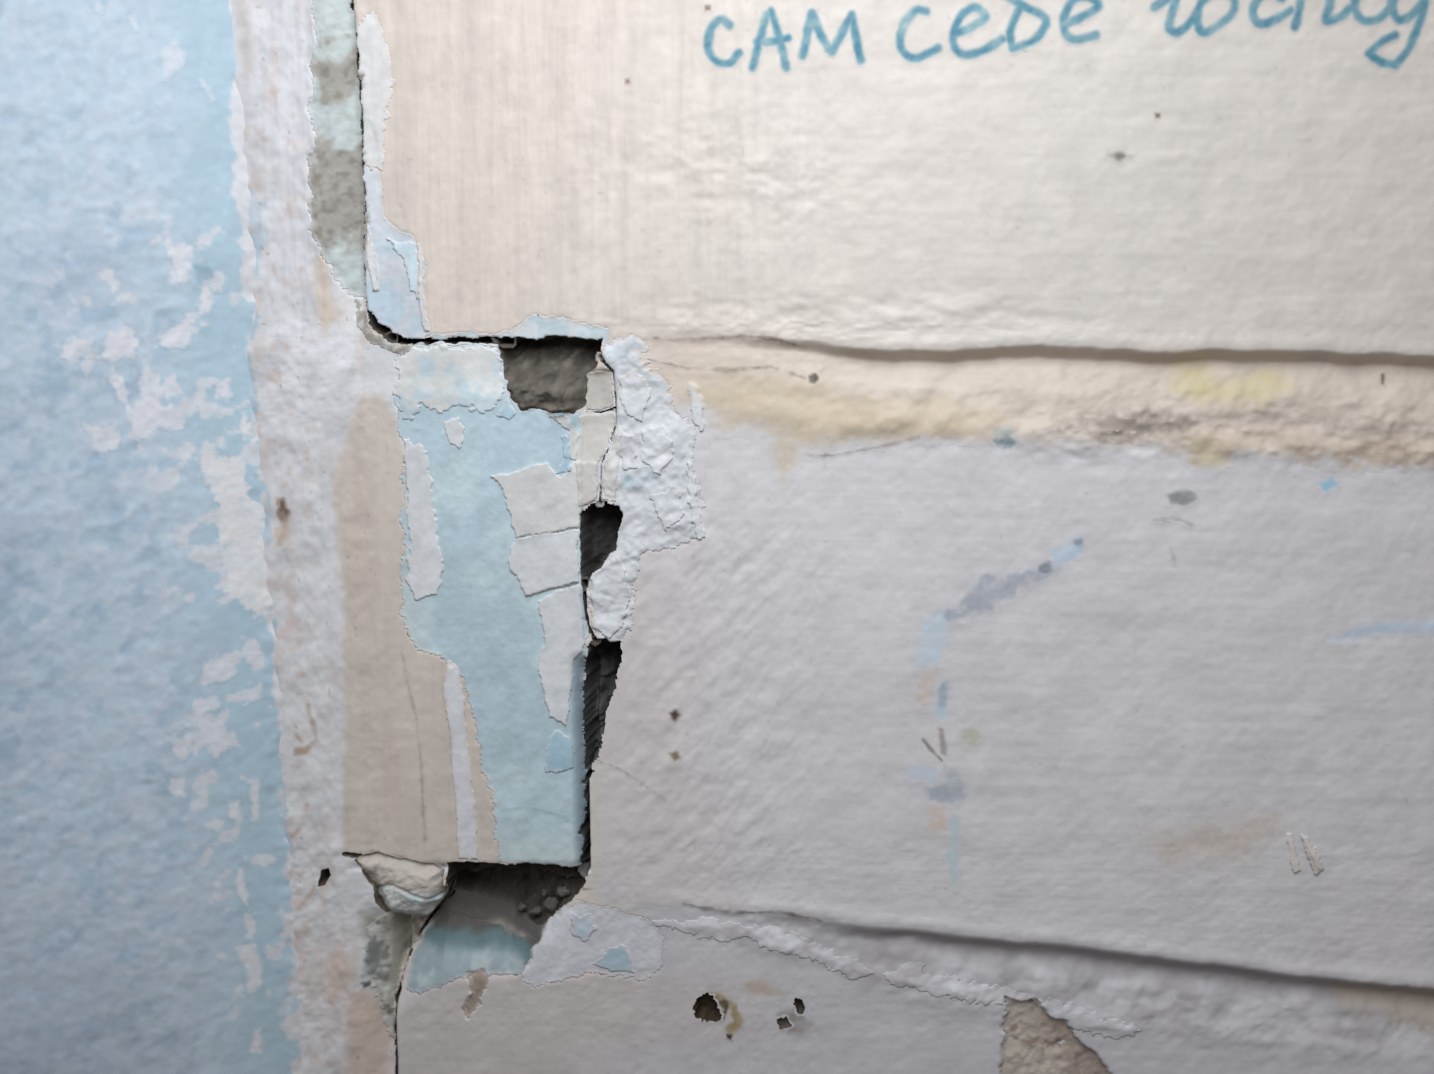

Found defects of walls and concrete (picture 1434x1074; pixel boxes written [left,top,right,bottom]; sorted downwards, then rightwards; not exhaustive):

crack [357,53,367,212]
peeling [53,242,220,454]
peeling [307,0,706,867]
peeling [165,375,274,799]
crack [342,309,828,1074]
peeling [222,776,263,824]
peeling [233,941,267,995]
peeling [364,900,664,1038]
spalling [777,1016,792,1030]
spalling [999,996,1111,1074]